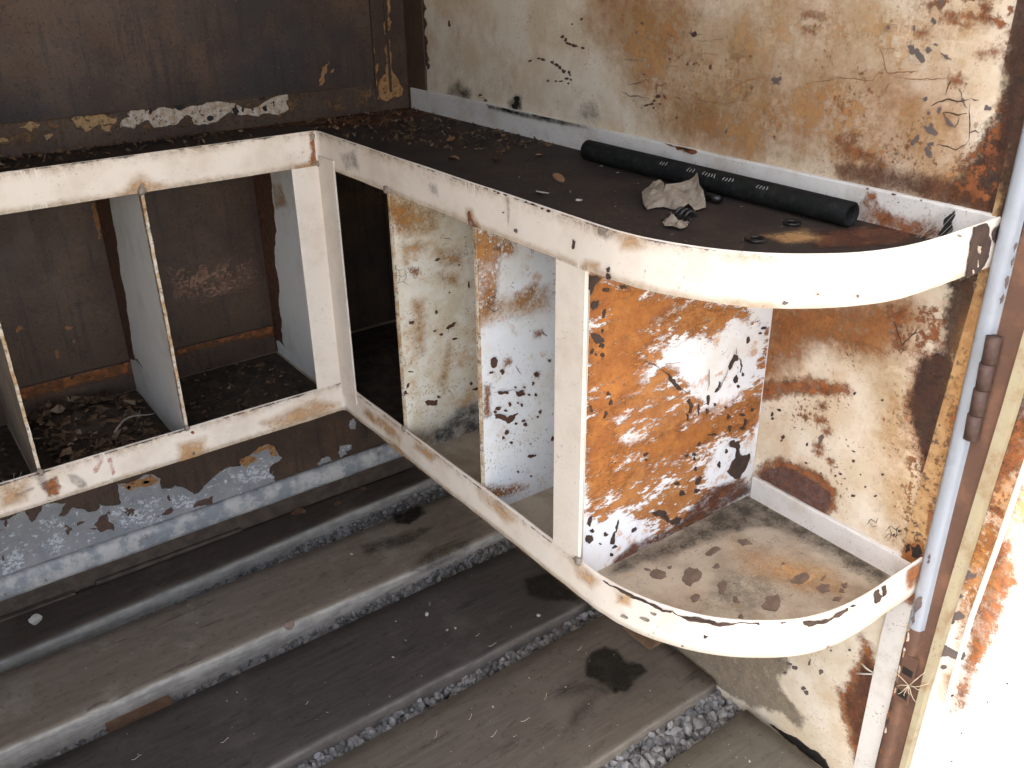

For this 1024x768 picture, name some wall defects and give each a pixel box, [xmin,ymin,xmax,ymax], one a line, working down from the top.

peeling [373,0,403,101]
peeling [8,121,54,140]
peeling [71,94,289,132]
corrosion [598,0,1024,238]
corrosion [754,273,985,563]
peeling [0,444,282,577]
water stain [525,572,575,601]
corrosion [950,395,1024,712]
water stain [587,648,645,693]